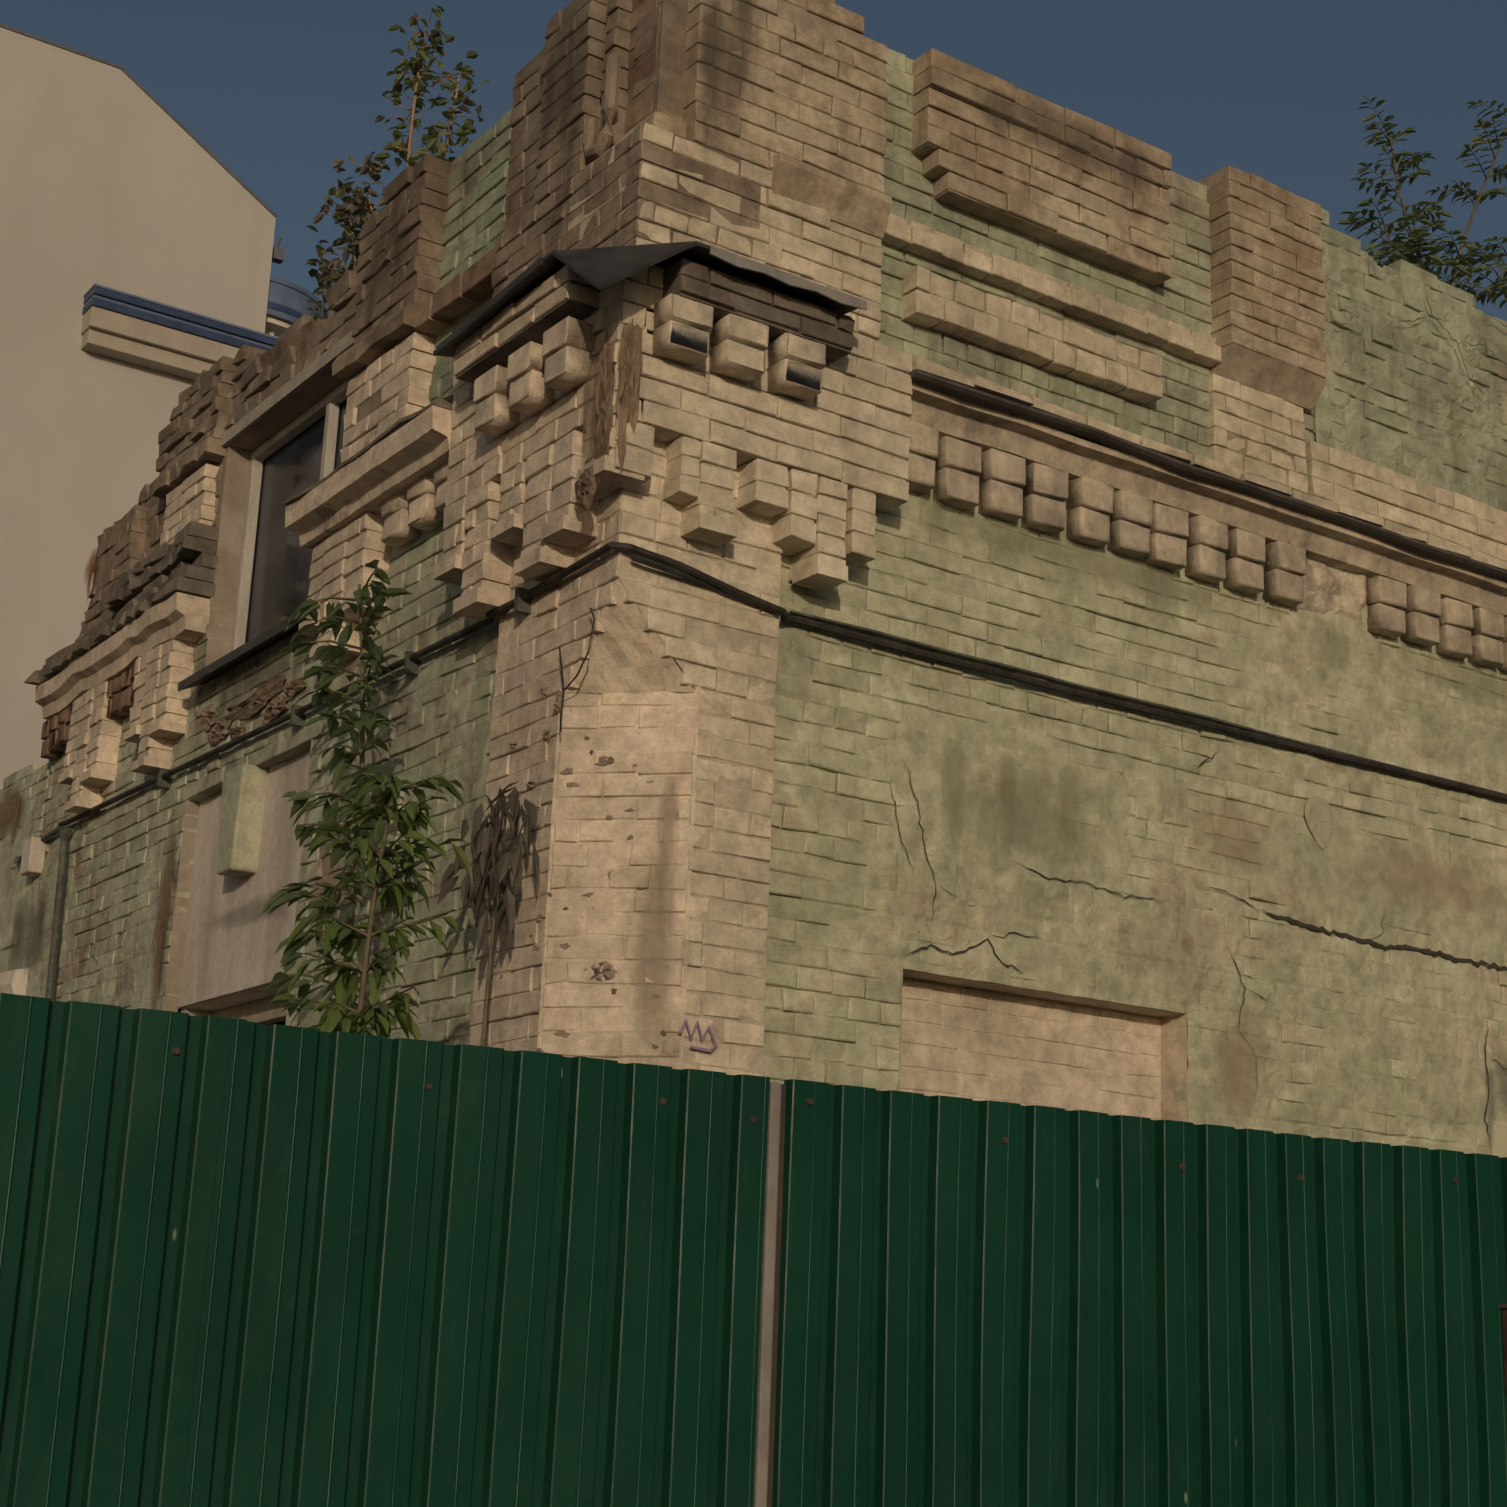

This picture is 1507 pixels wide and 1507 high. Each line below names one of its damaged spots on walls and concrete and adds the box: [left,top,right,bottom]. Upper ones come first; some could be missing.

crack [1210,887,1507,971]
crack [1218,945,1276,1097]
crack [1484,1017,1506,1149]